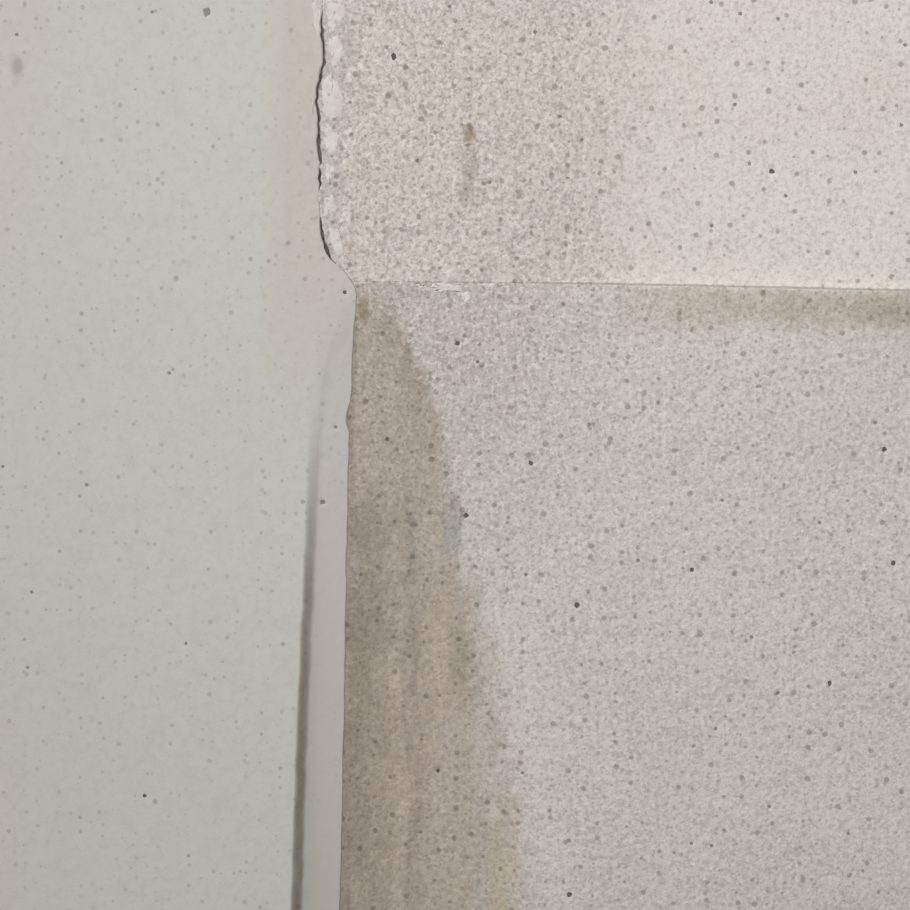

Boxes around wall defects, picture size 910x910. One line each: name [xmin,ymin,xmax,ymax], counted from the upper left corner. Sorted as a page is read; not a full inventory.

crack [312,16,326,188]
crack [315,217,357,905]
leakage [340,329,487,910]